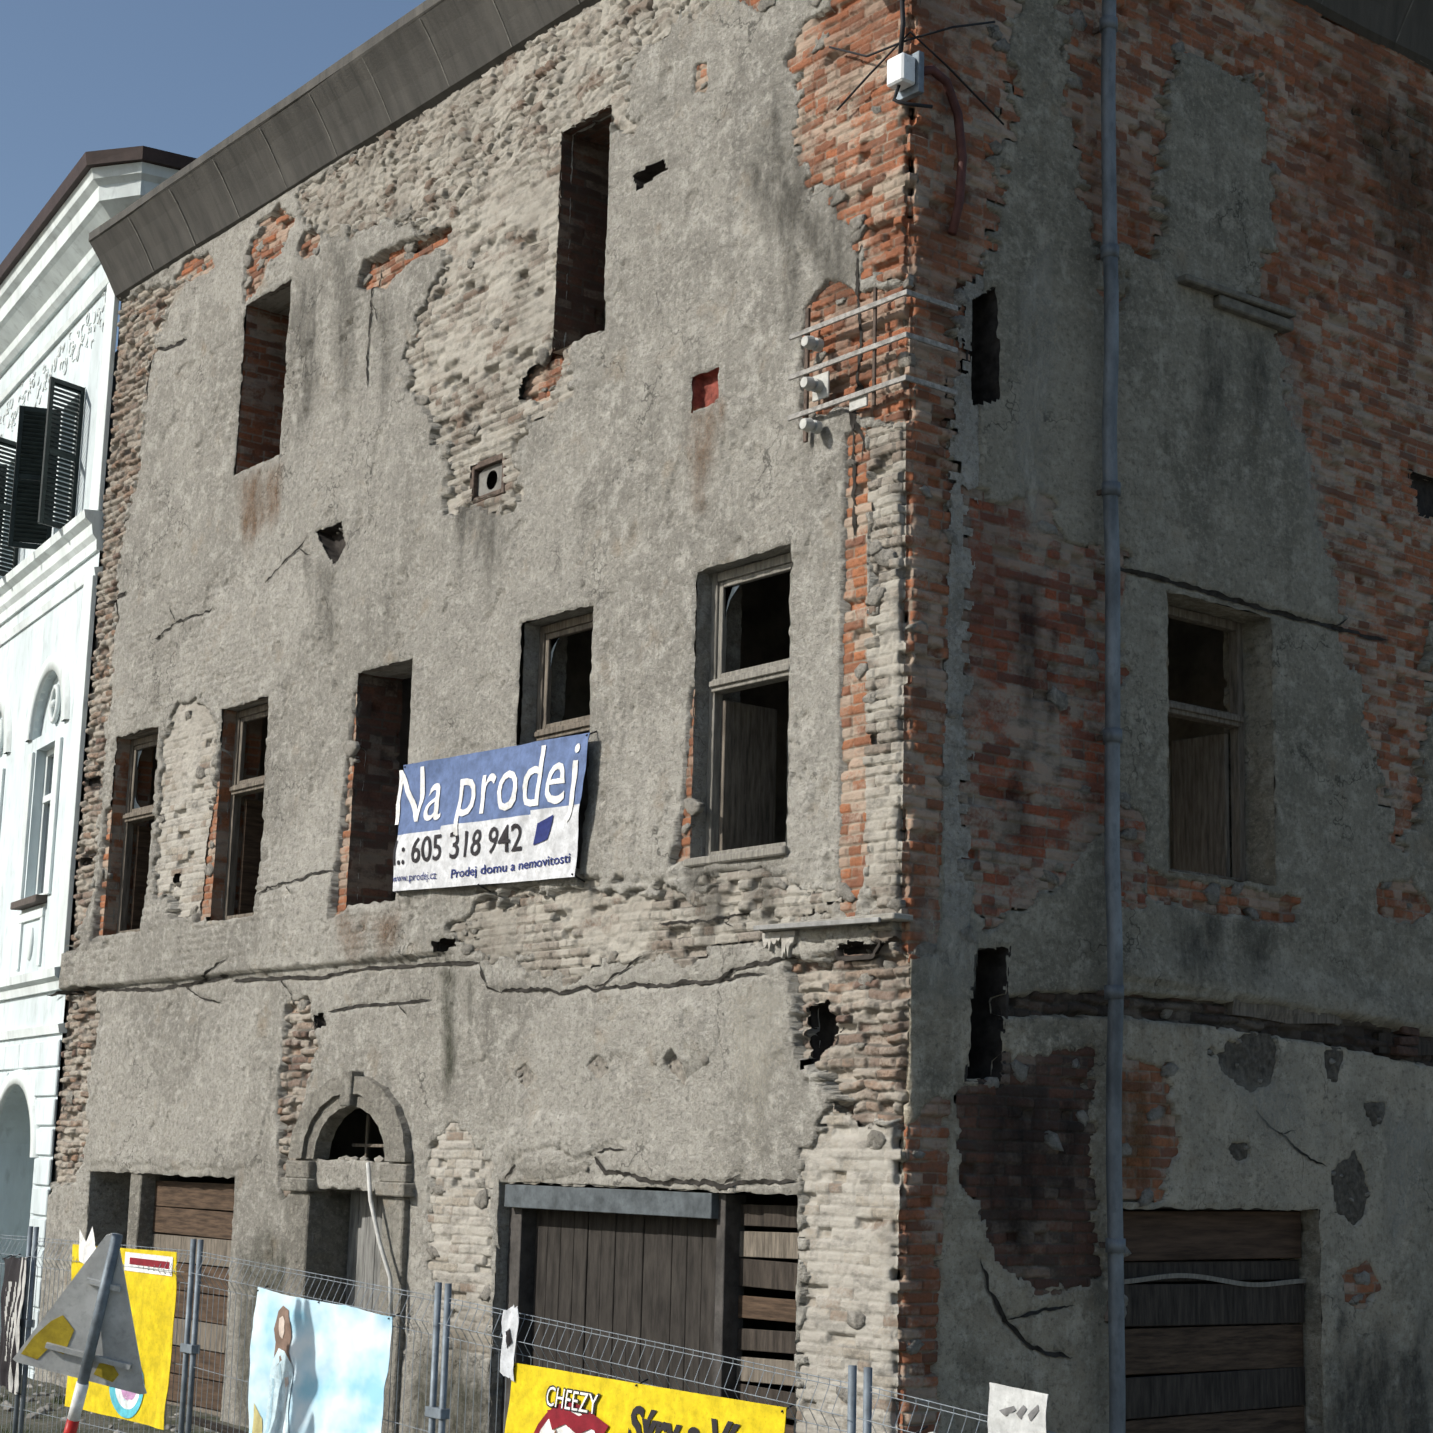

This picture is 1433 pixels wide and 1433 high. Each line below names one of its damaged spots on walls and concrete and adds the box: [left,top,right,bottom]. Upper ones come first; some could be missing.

flaking render [243,0,706,516]
spalling [960,287,1000,405]
spalling [71,253,222,949]
crack [265,538,309,583]
spalling [437,274,933,989]
crack [660,912,749,926]
spalling [54,989,100,1186]
crack [47,955,798,1014]
spalling [809,999,868,1064]
crack [594,1147,797,1190]
spalling [426,1122,497,1364]
crack [980,1261,1074,1359]